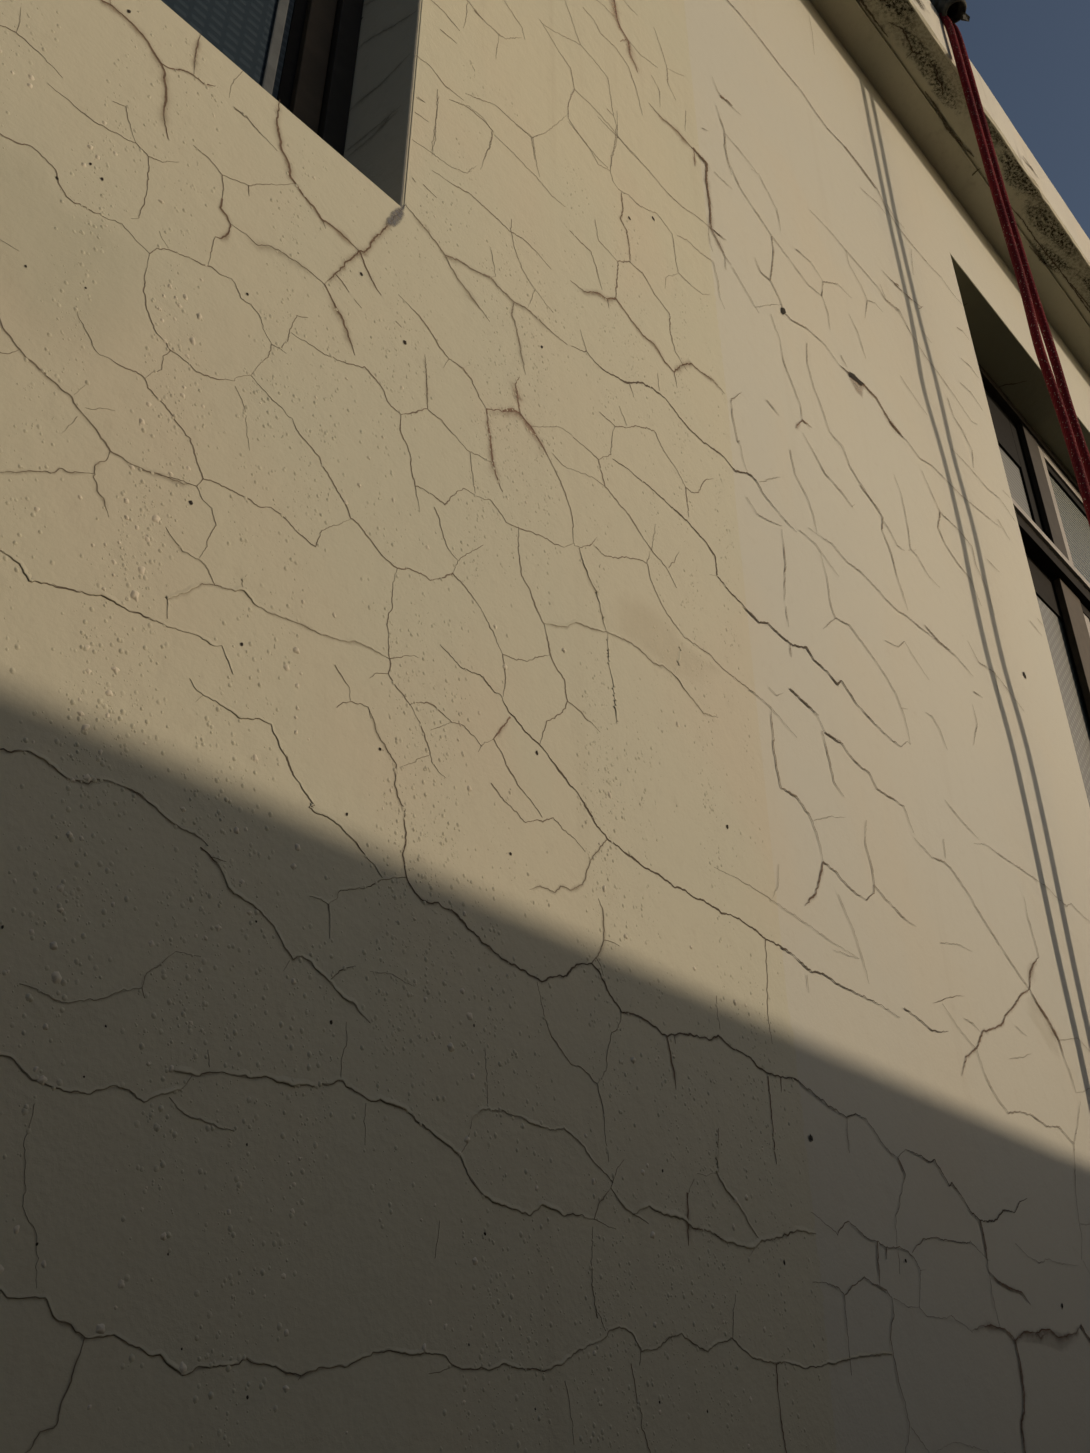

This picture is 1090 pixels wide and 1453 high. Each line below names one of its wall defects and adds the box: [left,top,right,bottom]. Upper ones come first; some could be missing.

crack [101,0,213,139]
crack [357,0,525,53]
crack [413,0,849,427]
crack [727,0,966,306]
crack [810,210,1010,608]
water stain [879,0,956,109]
water stain [985,116,1090,291]
crack [1011,207,1090,313]
crack [0,86,966,1164]
crack [790,688,1090,1156]
crack [0,1022,816,1254]
crack [0,1105,1090,1453]